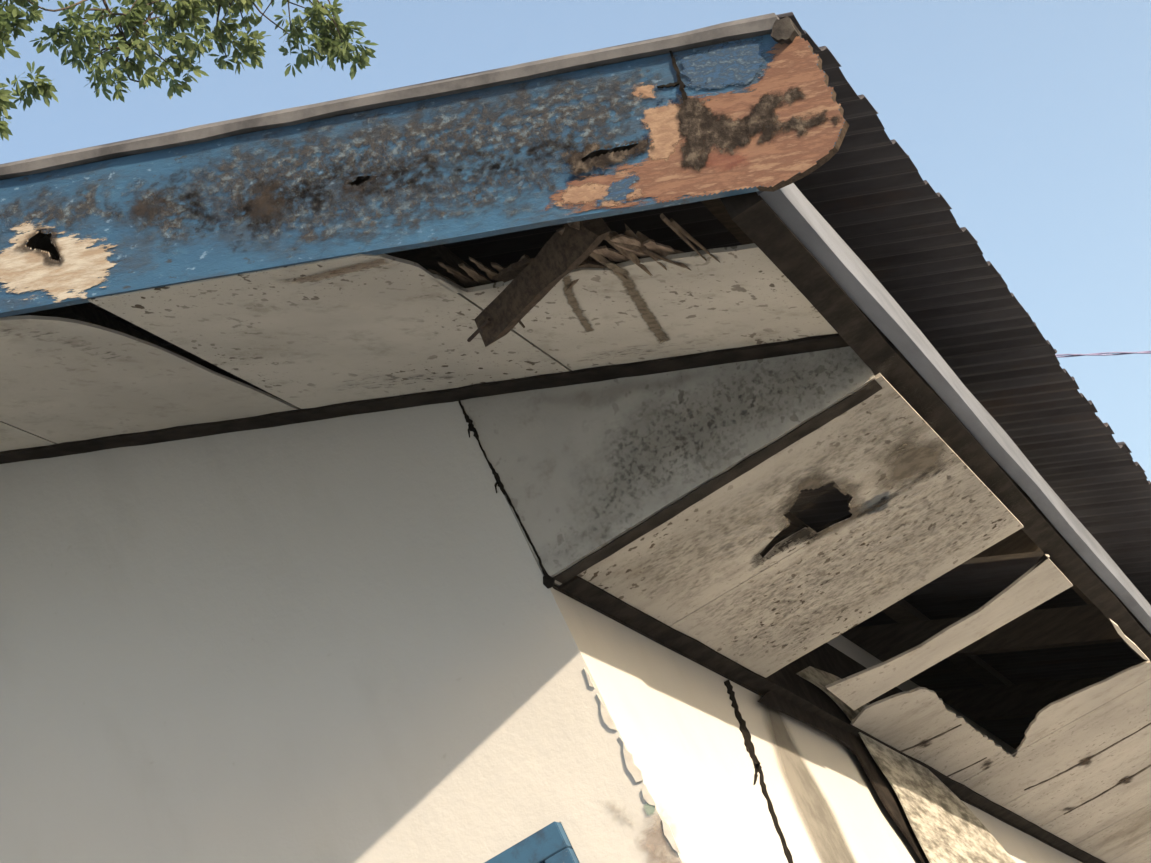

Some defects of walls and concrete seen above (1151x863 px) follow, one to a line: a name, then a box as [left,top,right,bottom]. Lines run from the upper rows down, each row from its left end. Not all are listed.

peeling [123,35,845,250]
peeling [0,184,120,303]
crack [458,401,555,589]
damp [753,429,959,568]
crack [724,679,793,863]